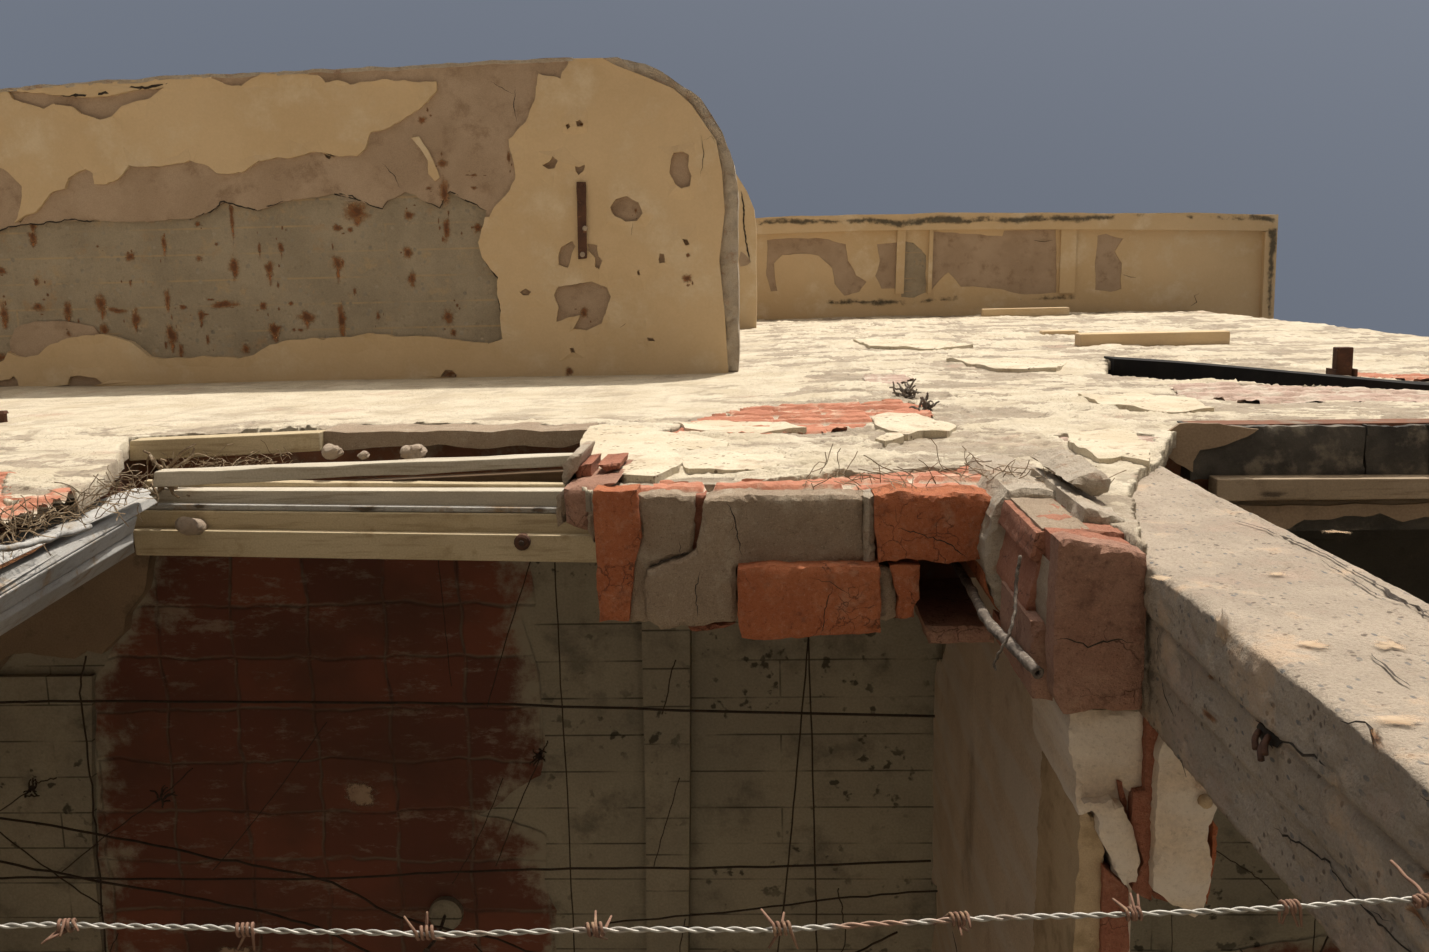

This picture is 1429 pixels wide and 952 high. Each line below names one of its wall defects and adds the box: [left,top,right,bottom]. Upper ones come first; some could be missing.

spalling [0,57,573,362]
rust [332,202,368,279]
spalling [603,57,750,371]
flaking render [766,230,1056,298]
rust [95,295,140,334]
rust [164,291,239,357]
rust [256,301,315,341]
flaking render [853,338,1067,373]
crack [1228,518,1429,617]
crack [1341,721,1374,747]
damp [346,783,375,806]
crack [1275,828,1411,952]